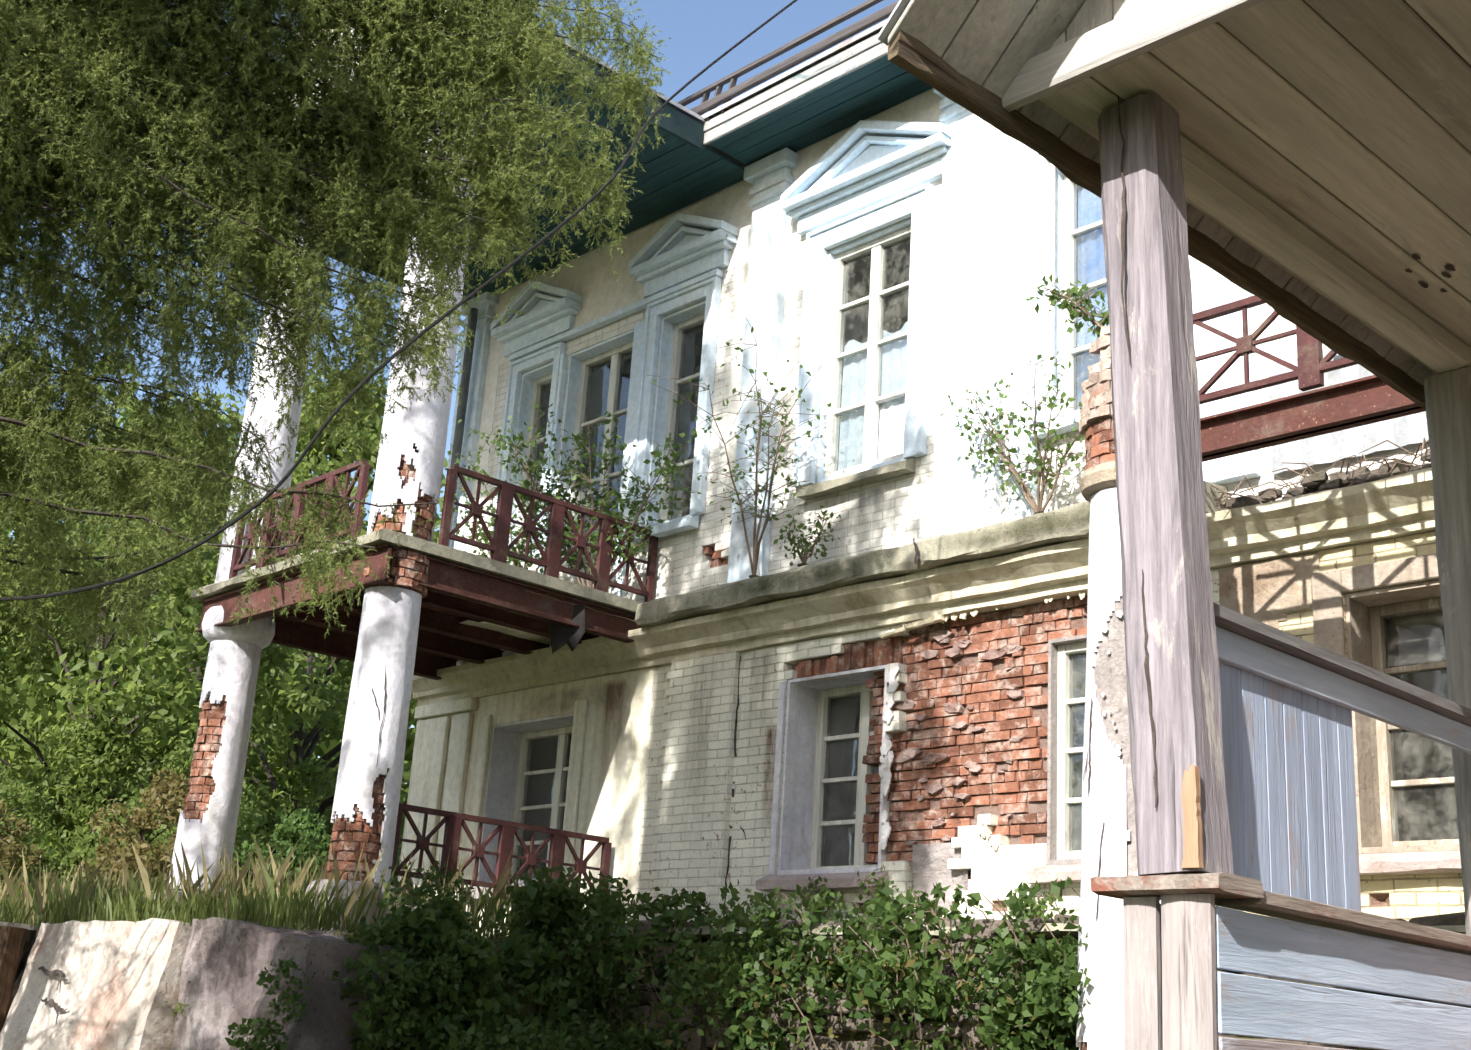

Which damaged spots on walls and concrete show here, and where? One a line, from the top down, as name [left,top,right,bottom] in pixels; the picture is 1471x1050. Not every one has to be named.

crack [1118,96,1131,365]
flaking render [374,455,435,541]
flaking render [183,692,227,823]
flaking render [327,769,389,883]
crack [723,656,746,917]
flaking render [792,591,1137,912]